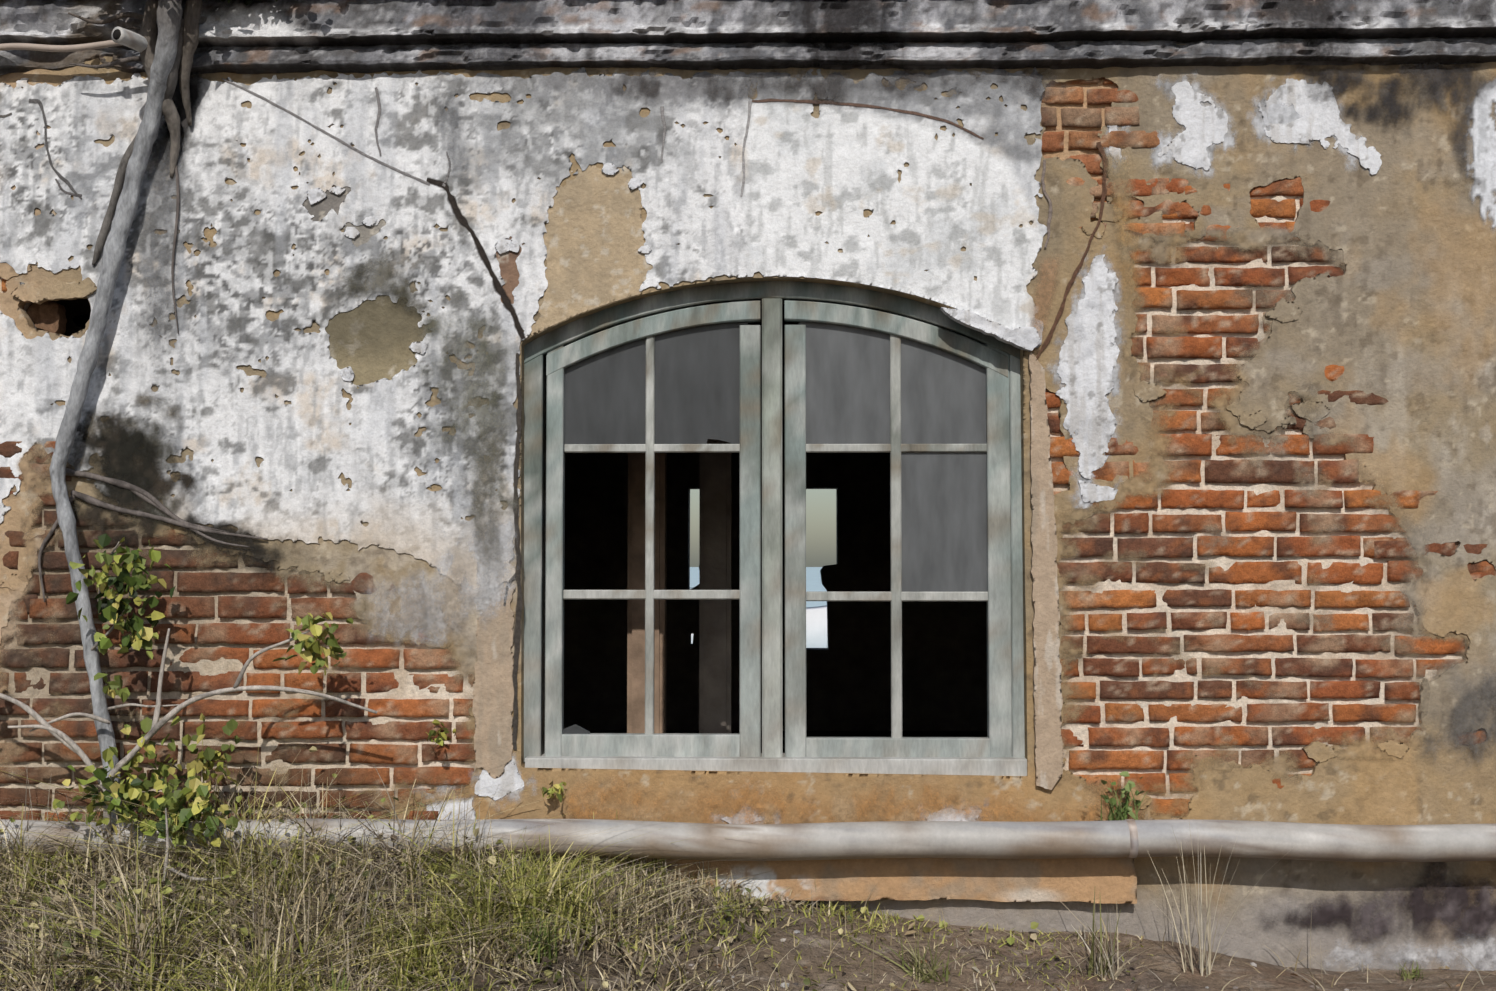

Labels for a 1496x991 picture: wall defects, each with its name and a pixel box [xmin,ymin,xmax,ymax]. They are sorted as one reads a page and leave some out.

crack [659,106,667,162]
crack [740,98,984,197]
spalling [0,263,97,336]
peeling [325,295,430,389]
peeling [495,236,524,304]
peeling [530,163,653,336]
crack [222,78,525,750]
spalling [1041,77,1496,820]
spalling [0,441,524,823]
leakage [1427,674,1496,755]
leakage [1268,862,1496,971]